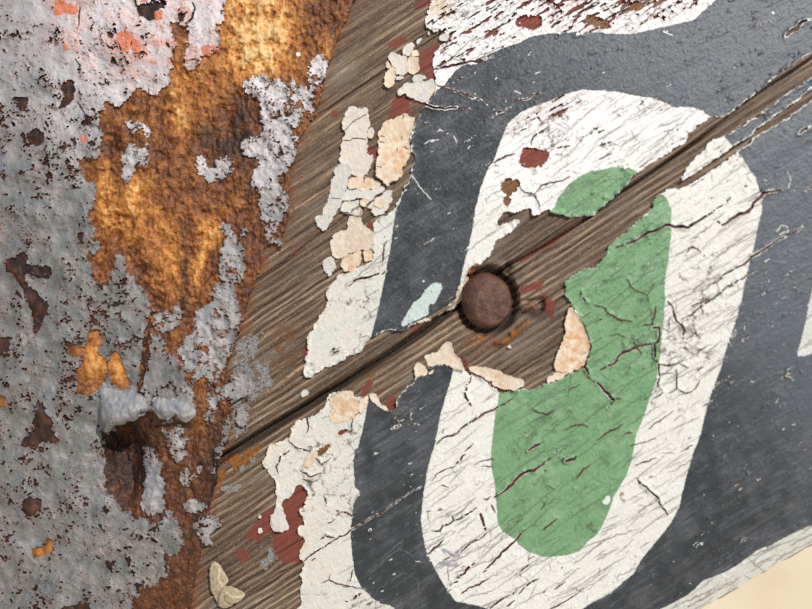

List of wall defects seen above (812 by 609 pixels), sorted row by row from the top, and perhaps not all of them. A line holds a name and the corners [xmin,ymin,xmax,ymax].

peeling [515,14,543,30]
peeling [384,28,449,102]
peeling [315,106,415,276]
crack [616,189,782,253]
corrosion [67,0,355,609]
peeling [414,342,525,391]
corrosion [496,303,535,346]
peeling [547,307,591,383]
crack [565,227,802,515]
crack [246,356,513,593]
crack [427,442,591,594]
crack [490,556,585,609]